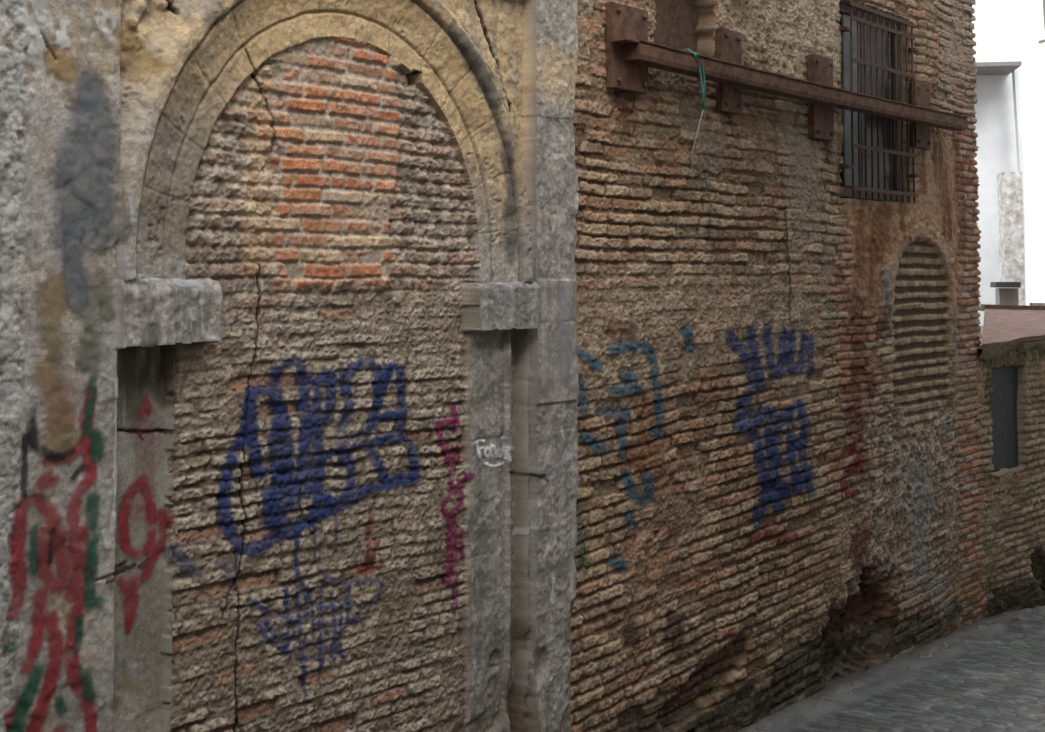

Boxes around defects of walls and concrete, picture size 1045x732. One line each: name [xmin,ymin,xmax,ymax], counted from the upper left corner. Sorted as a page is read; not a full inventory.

crack [166,0,178,14]
crack [247,264,261,387]
crack [220,445,258,732]
water stain [982,552,1045,617]